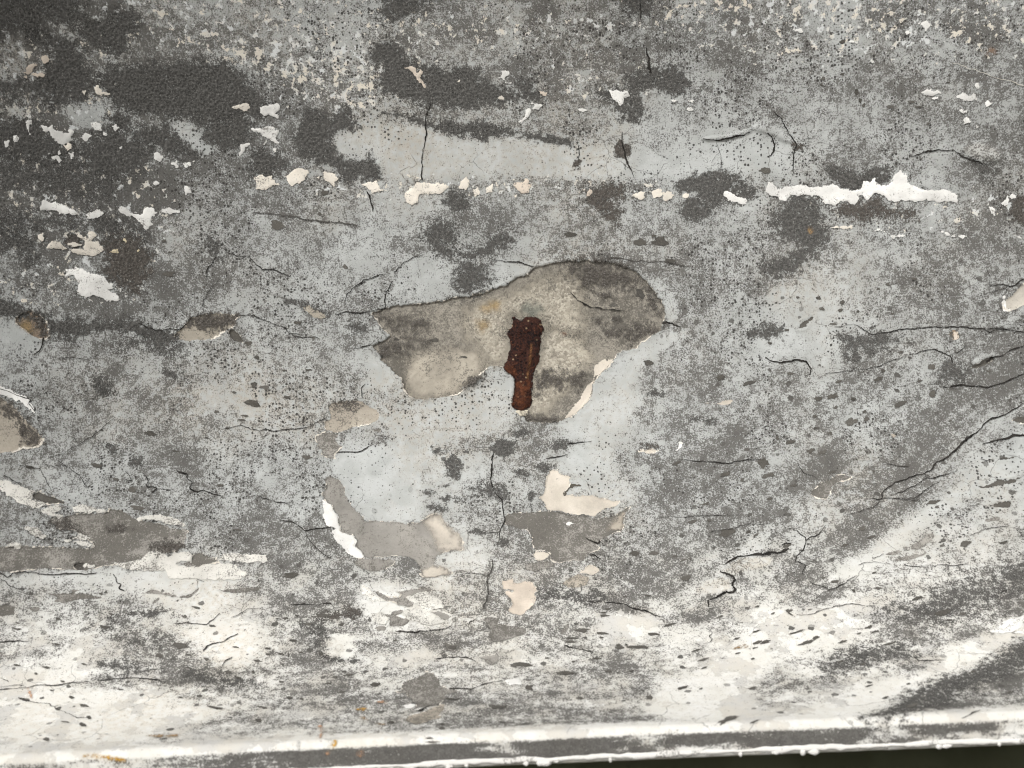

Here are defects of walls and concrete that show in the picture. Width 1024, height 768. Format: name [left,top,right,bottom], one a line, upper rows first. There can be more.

leakage [0,0,383,298]
crack [415,103,431,183]
peeling [404,177,493,205]
peeling [759,167,958,206]
peeling [174,308,259,360]
crack [335,255,421,315]
peeling [371,249,668,425]
rust [503,316,544,416]
peeling [321,476,464,641]
crack [398,452,505,633]
peeling [484,469,631,643]
crack [661,403,1024,644]